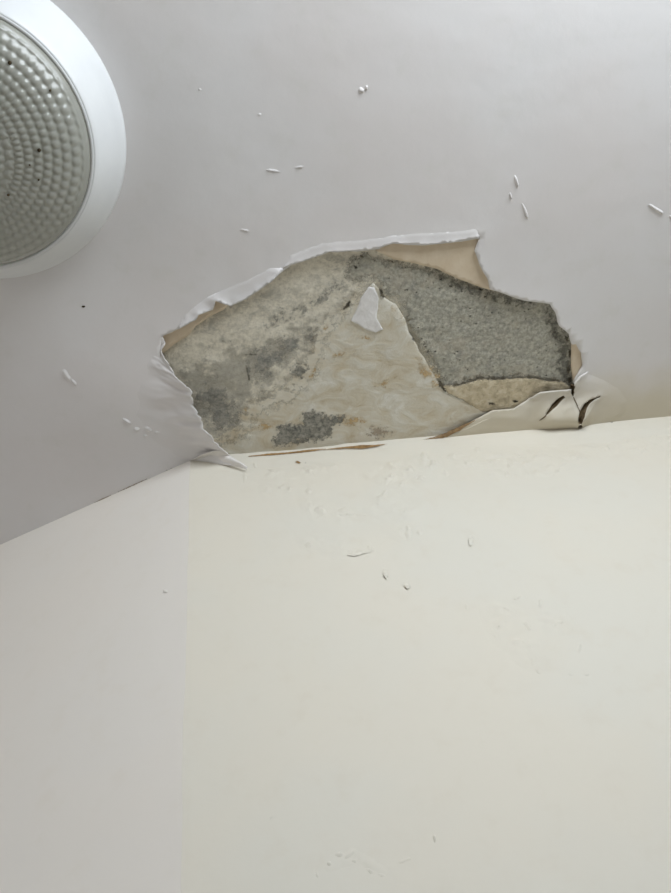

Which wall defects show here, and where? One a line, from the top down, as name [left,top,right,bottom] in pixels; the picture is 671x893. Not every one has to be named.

flaking render [122,229,582,470]